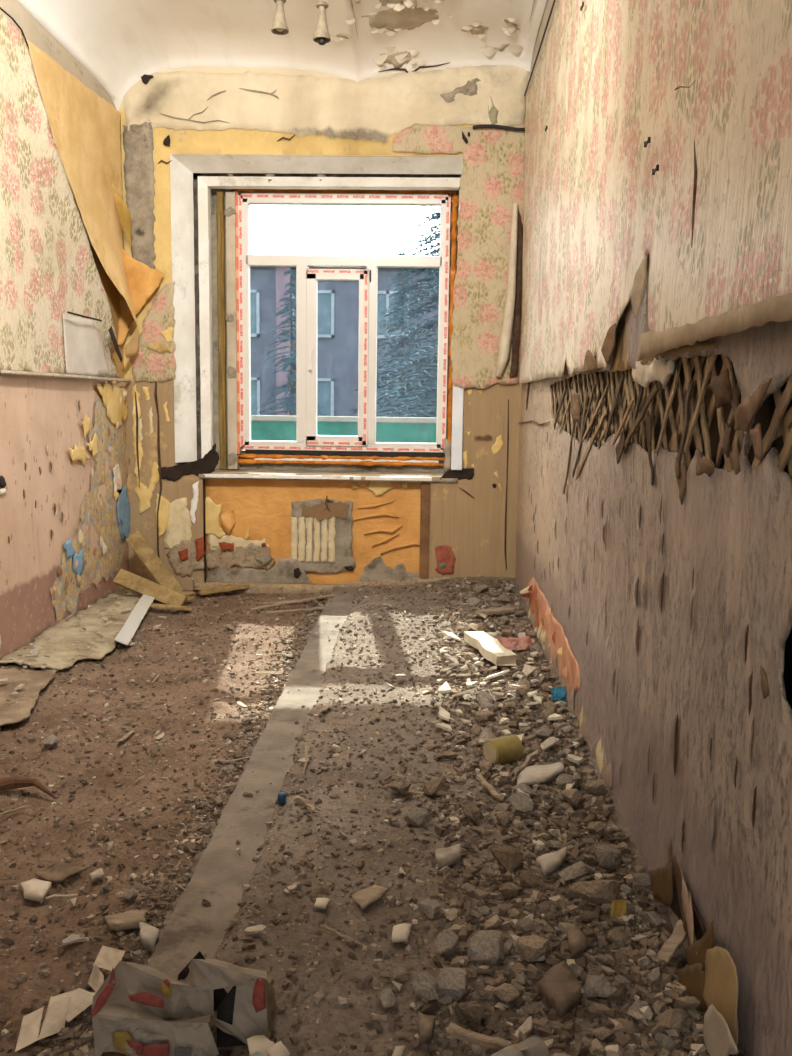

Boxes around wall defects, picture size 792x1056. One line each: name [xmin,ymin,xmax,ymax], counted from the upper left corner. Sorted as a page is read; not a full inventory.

peeling [26,39,175,358]
crack [160,88,279,123]
peeling [331,0,522,71]
spalling [440,78,498,124]
peeling [49,381,456,623]
peeling [423,577,612,790]
peeling [650,839,745,1056]